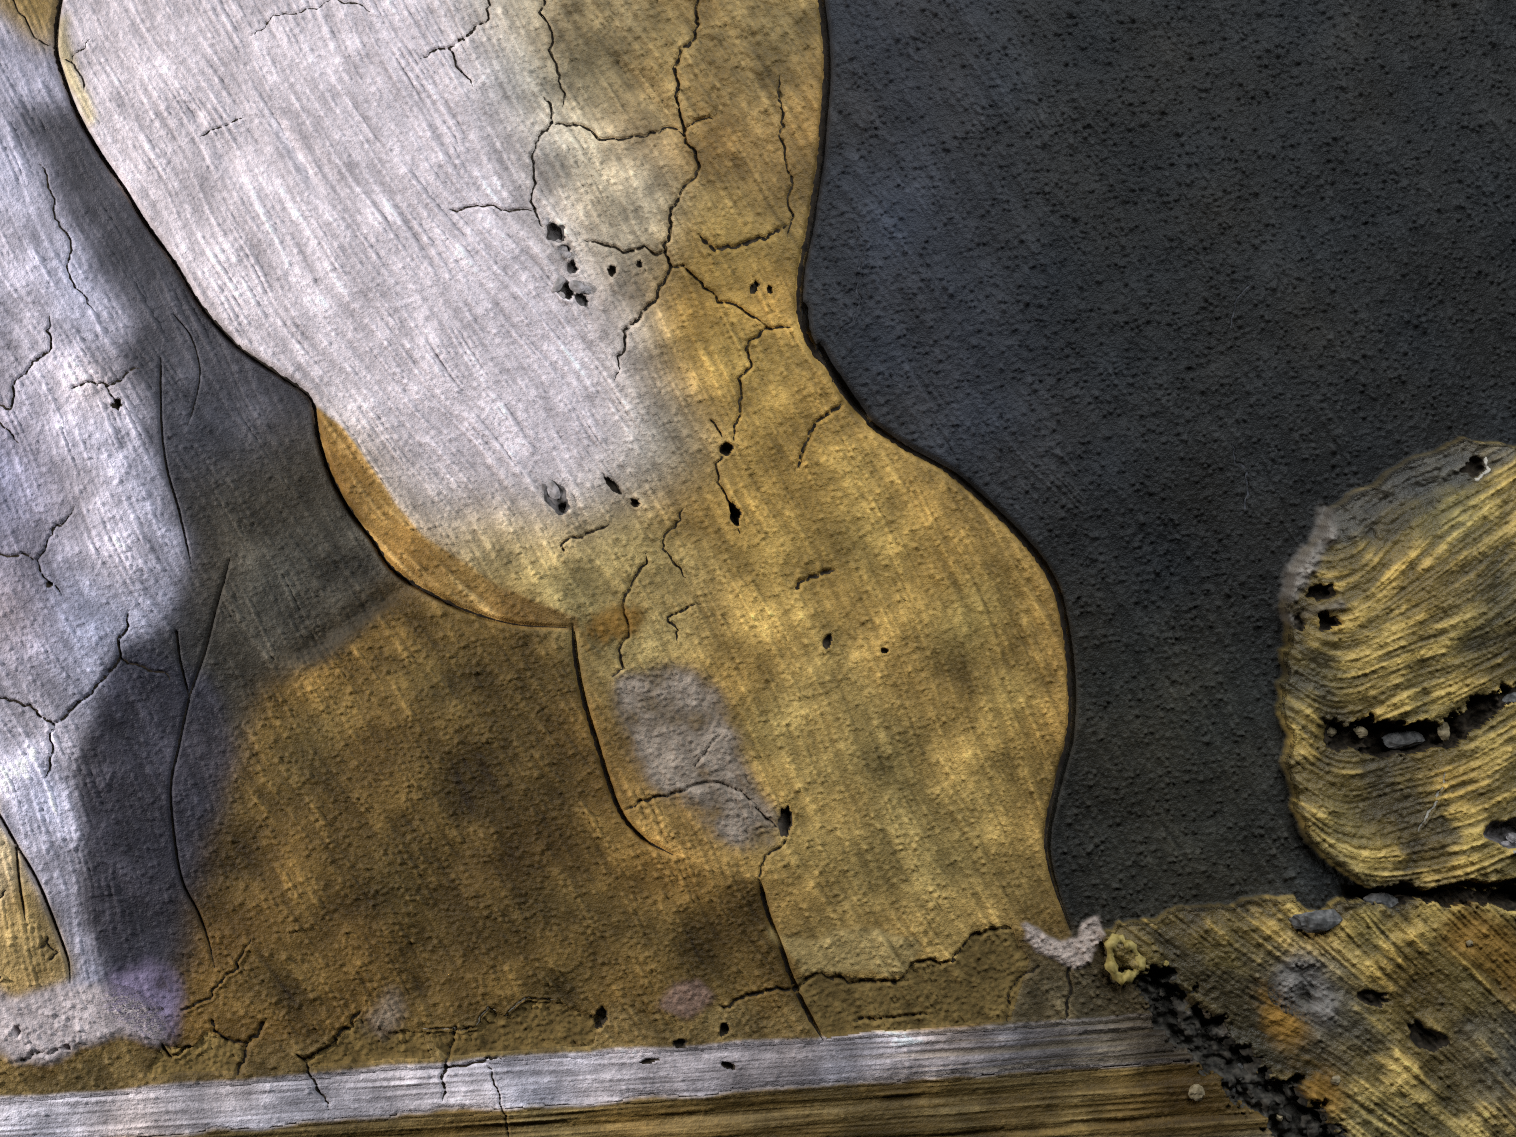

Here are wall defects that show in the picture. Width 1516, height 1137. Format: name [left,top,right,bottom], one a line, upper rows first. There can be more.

crack [420,0,491,86]
crack [40,165,93,309]
crack [450,0,794,534]
crack [0,316,52,443]
spalling [1460,456,1491,481]
spalling [1293,584,1342,632]
crack [0,613,170,777]
spalling [1483,818,1516,854]
spalling [1491,889,1516,912]
spalling [1357,990,1389,1008]
spalling [1407,1019,1450,1053]
crack [440,1027,509,1137]